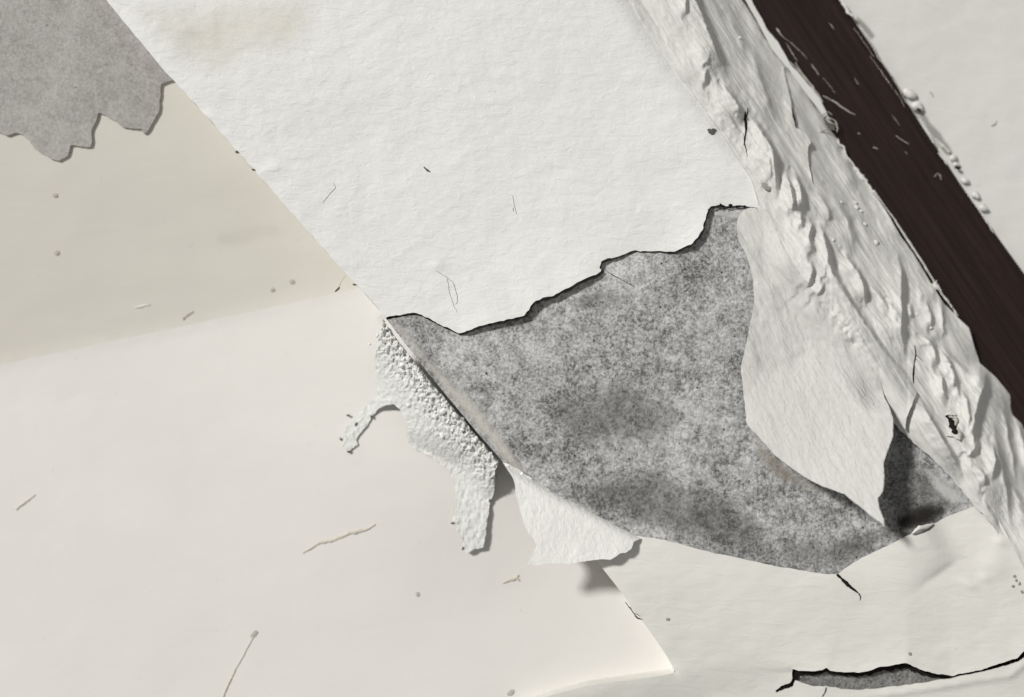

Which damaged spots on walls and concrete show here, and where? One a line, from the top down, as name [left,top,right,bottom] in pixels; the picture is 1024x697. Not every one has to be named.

peeling [0,0,173,161]
spalling [340,203,974,574]
crack [837,574,861,599]
crack [776,652,1024,697]